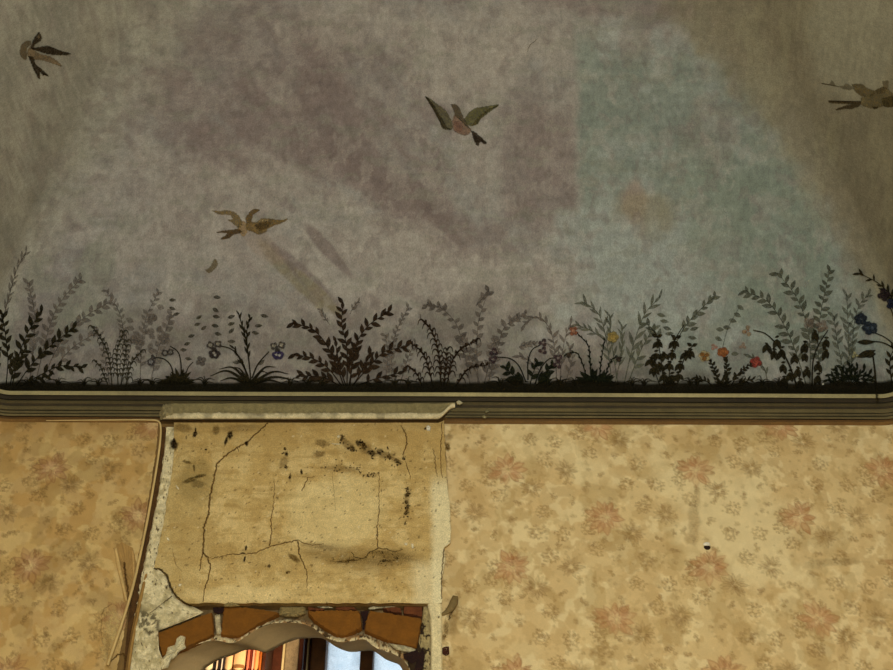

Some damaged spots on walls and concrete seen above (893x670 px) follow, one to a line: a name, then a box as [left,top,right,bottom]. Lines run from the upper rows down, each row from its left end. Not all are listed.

flaking render [46,419,458,670]
crack [150,423,402,613]
damp [324,434,406,477]